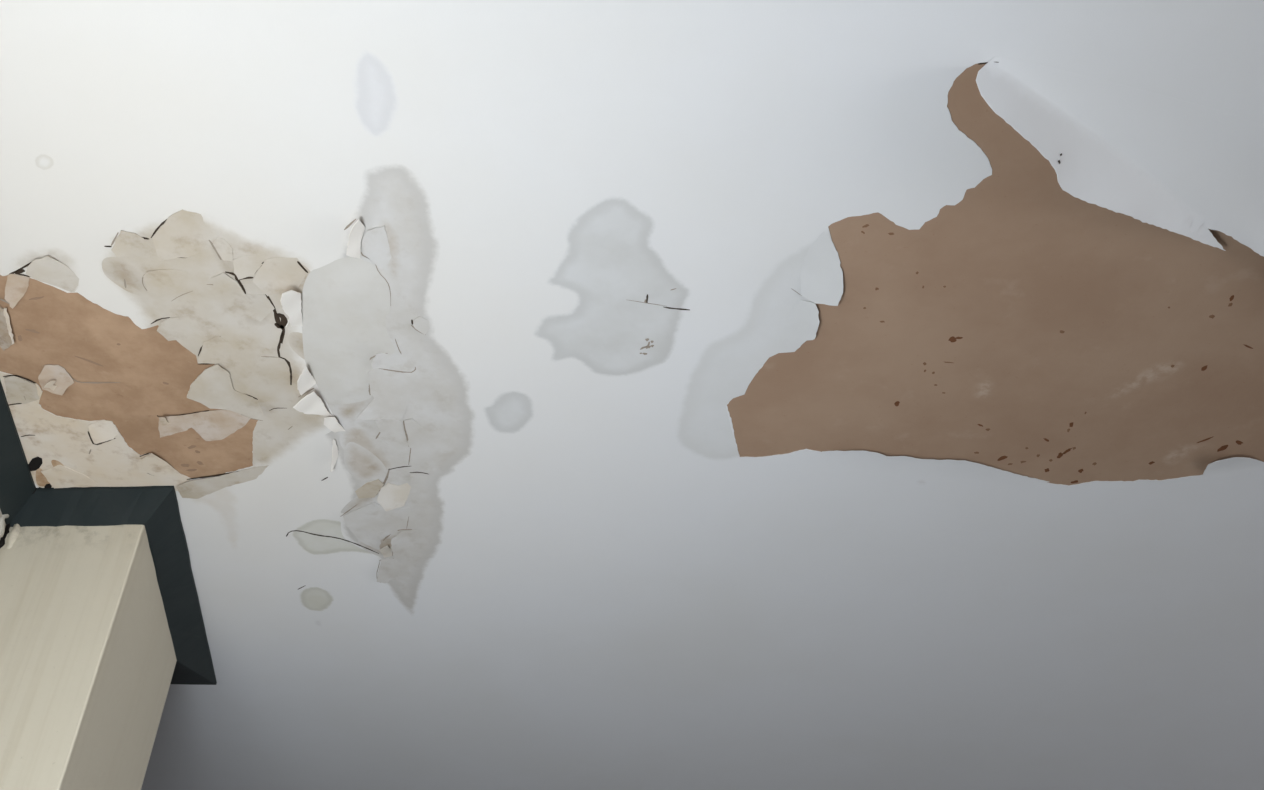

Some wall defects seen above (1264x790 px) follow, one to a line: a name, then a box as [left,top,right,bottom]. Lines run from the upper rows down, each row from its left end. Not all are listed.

spalling [0,514,20,549]
damp [7,245,82,292]
damp [0,372,242,554]
peeling [0,256,278,499]
peeling [104,209,345,481]
damp [97,161,537,620]
peeling [344,218,391,306]
peeling [340,339,429,583]
damp [531,194,694,379]
peeling [727,56,1264,487]